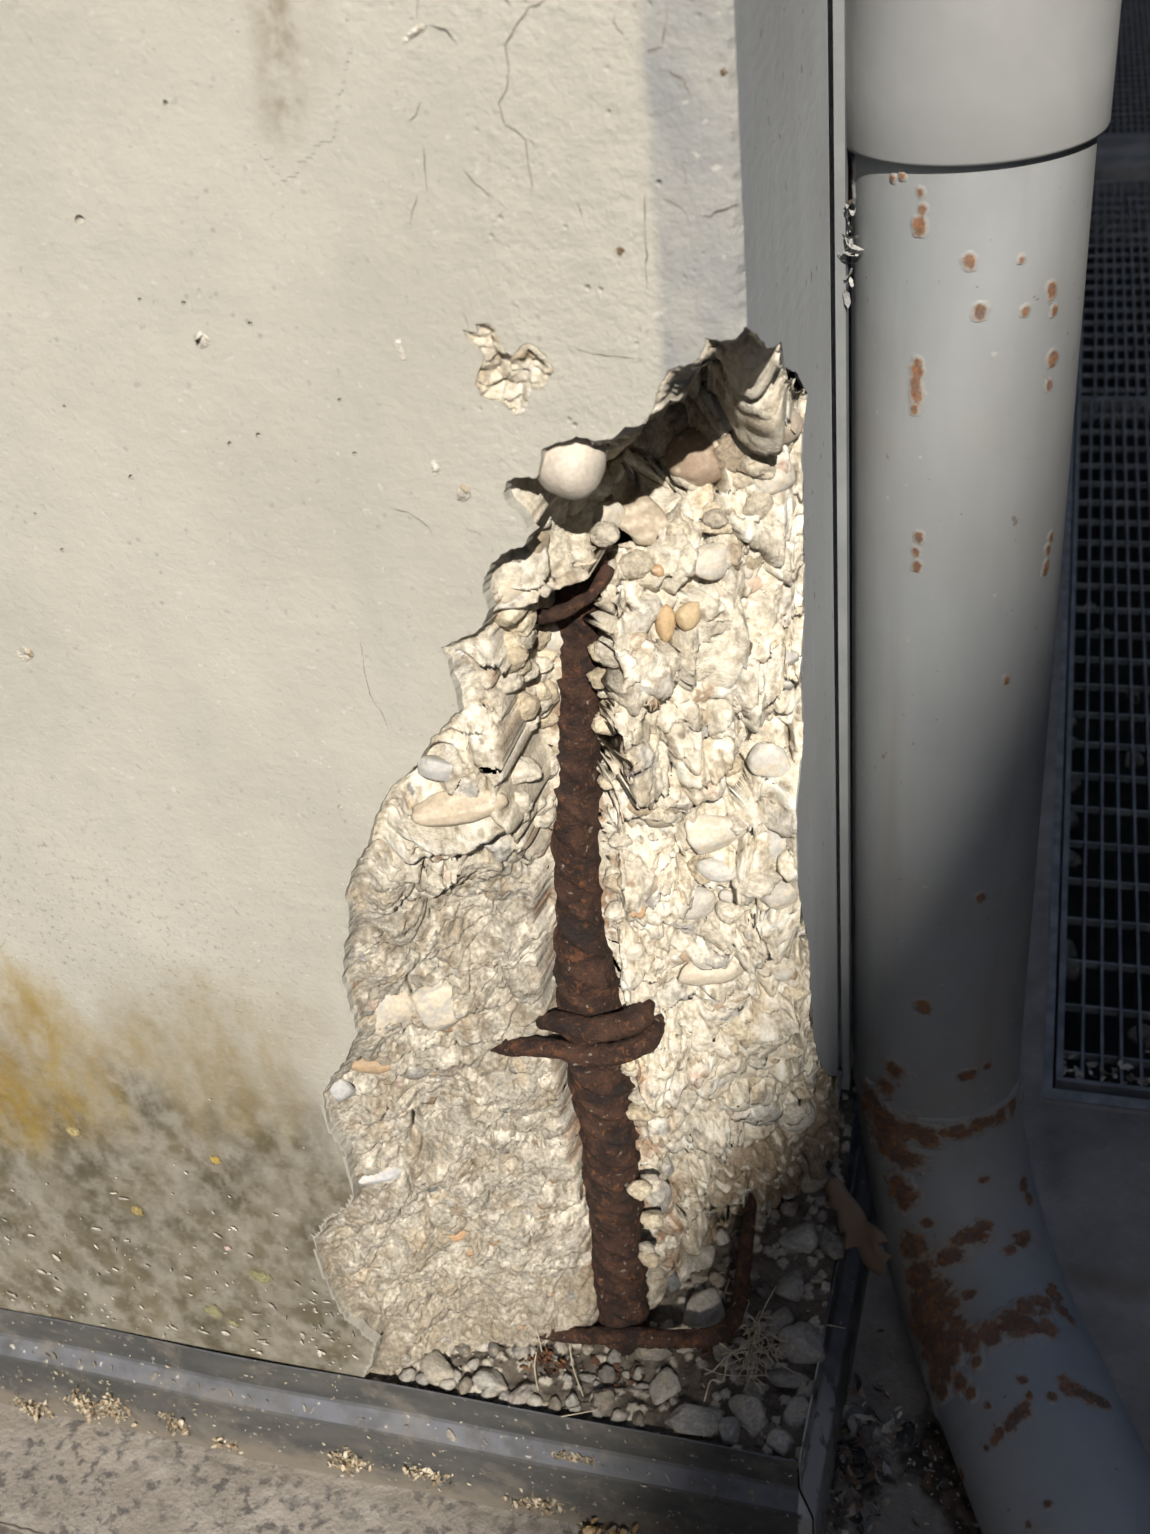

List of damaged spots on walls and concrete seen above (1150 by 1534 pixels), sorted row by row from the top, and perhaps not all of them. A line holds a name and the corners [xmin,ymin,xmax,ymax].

crack [417,0,457,43]
crack [410,101,427,229]
crack [498,0,543,195]
spalling [293,323,841,1400]
peeling [2,1217,177,1356]
leakage [0,1109,375,1379]
peeling [198,1289,286,1355]
corrosion [499,1347,645,1388]